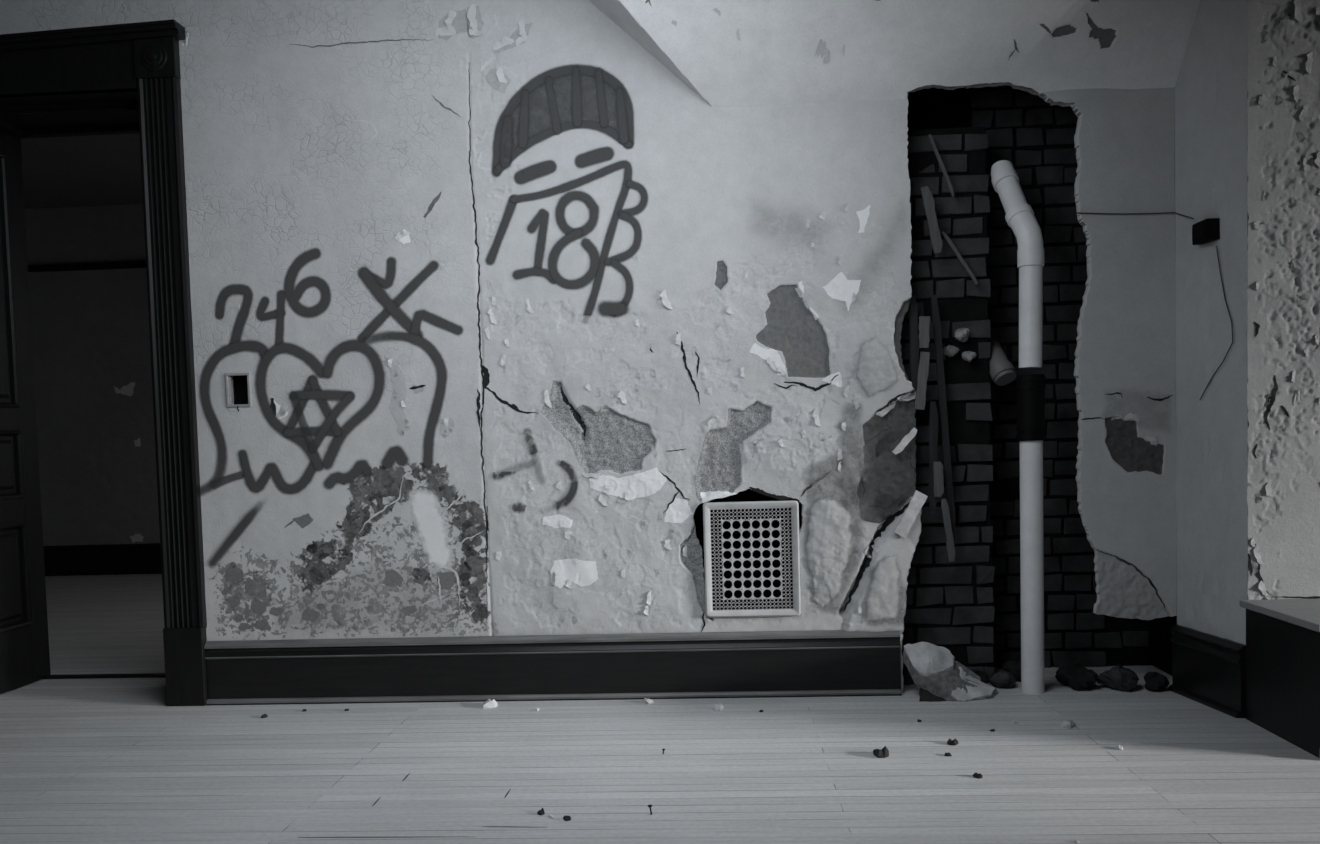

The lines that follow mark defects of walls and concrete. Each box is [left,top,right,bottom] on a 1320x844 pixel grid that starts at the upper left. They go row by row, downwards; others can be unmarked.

peeling [435,4,532,94]
spalling [1039,0,1116,49]
spalling [715,261,728,290]
flaking render [822,255,861,311]
spalling [749,280,860,409]
spalling [541,369,667,506]
spalling [857,297,916,558]
spalling [1105,413,1164,474]
water stain [211,462,491,638]
flaking render [550,549,607,589]
spalling [640,401,847,620]
crack [1097,550,1168,614]